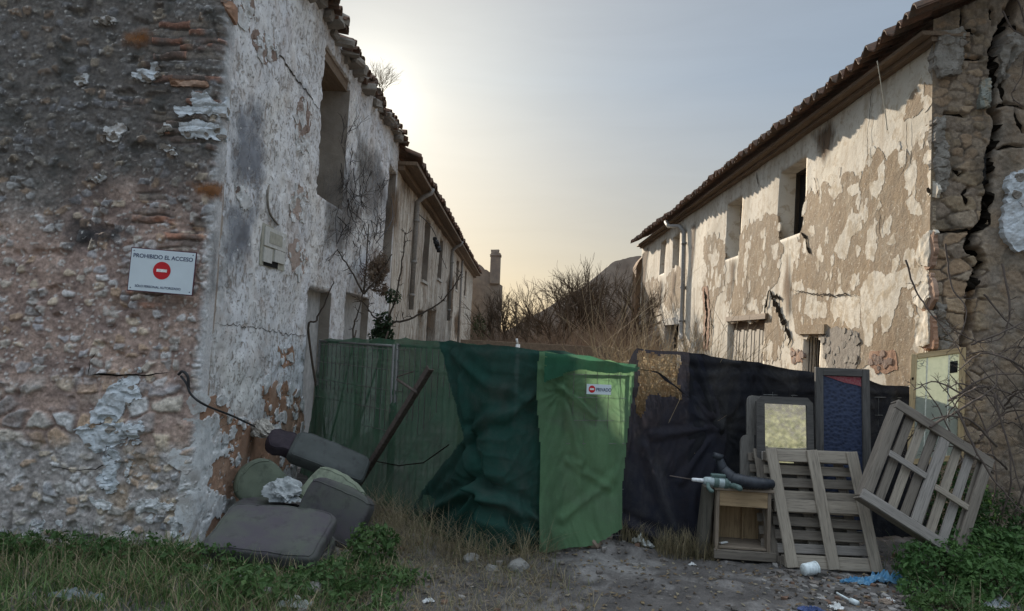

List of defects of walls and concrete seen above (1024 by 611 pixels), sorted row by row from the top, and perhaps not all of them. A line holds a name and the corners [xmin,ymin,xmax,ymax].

flaking render [131,62,231,156]
leakage [228,209,251,260]
crack [702,276,856,351]
flaking render [693,26,970,386]
crack [939,10,1022,292]
flaking render [73,344,305,547]